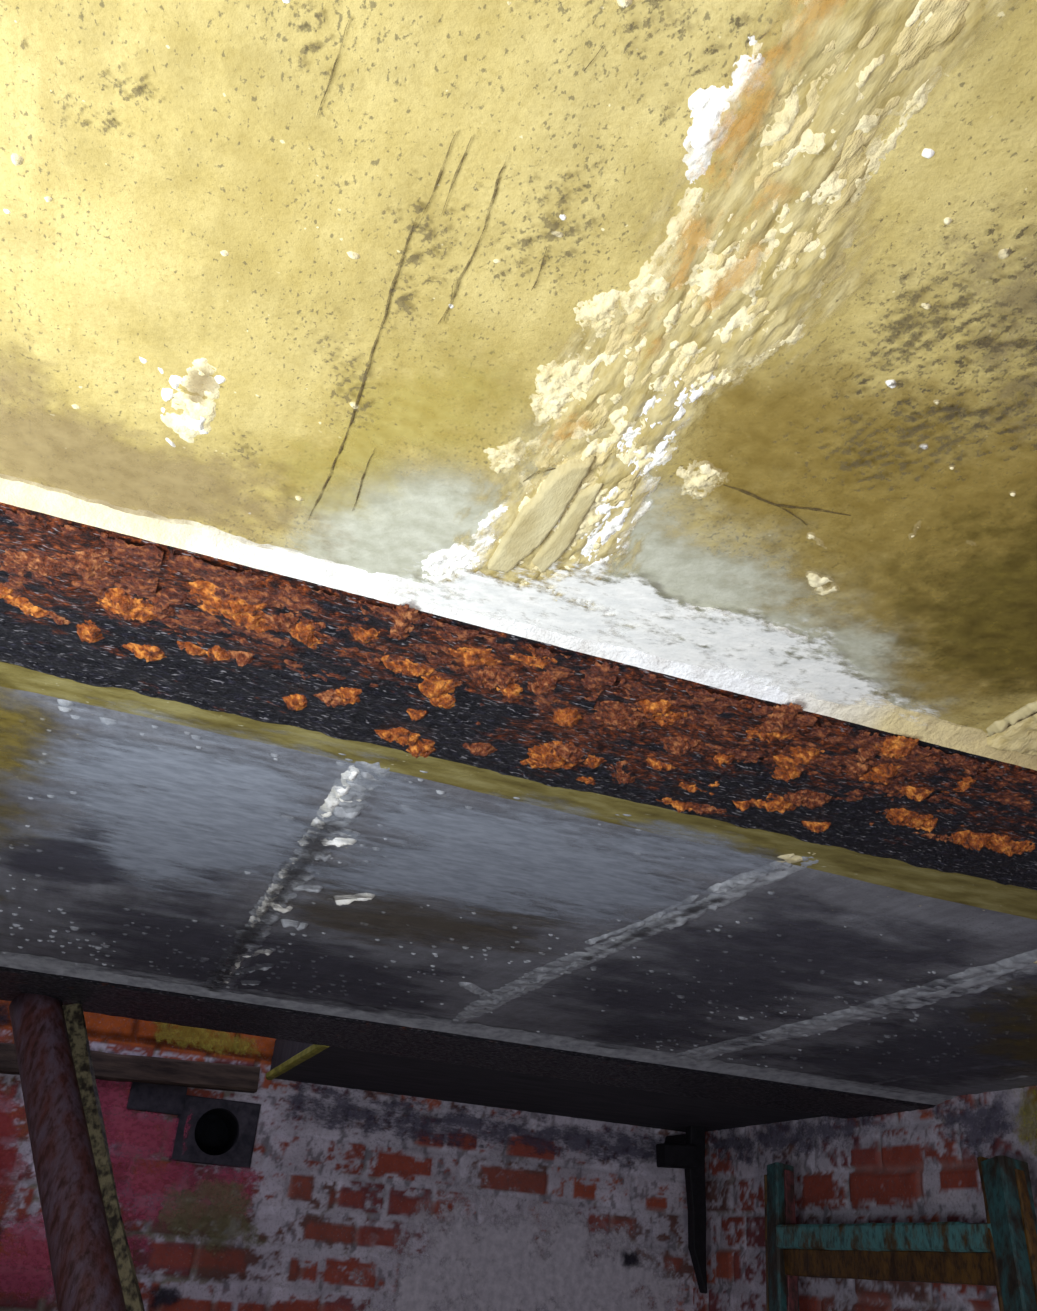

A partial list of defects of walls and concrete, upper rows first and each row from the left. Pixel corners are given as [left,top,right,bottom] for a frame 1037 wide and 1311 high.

damp [570,0,690,55]
crack [438,167,504,324]
damp [485,163,600,294]
crack [309,131,472,518]
peeling [139,357,226,447]
damp [295,197,1037,717]
crack [723,484,851,525]
corrosion [0,510,1037,841]
peeling [353,1184,680,1311]